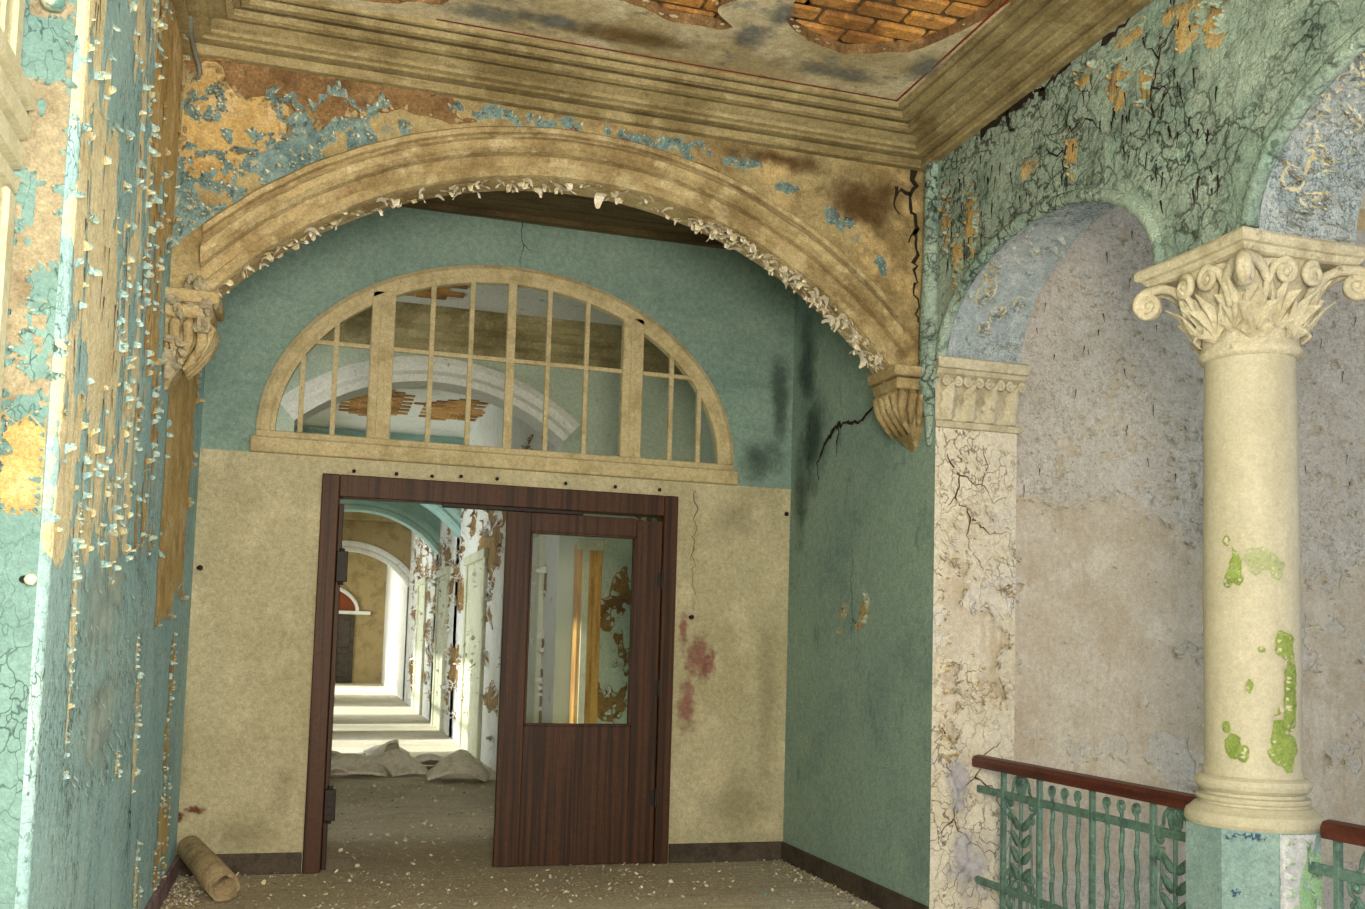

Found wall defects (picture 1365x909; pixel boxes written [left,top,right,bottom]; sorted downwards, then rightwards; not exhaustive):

flaking render [790,0,996,49]
crack [893,0,1219,322]
peeling [1269,51,1365,242]
peeling [0,0,887,909]
crack [816,407,873,479]
crack [943,449,1040,569]
peeling [934,0,1238,882]
peeling [1222,535,1285,588]
peeling [1258,292,1365,826]
peeling [1222,721,1250,763]